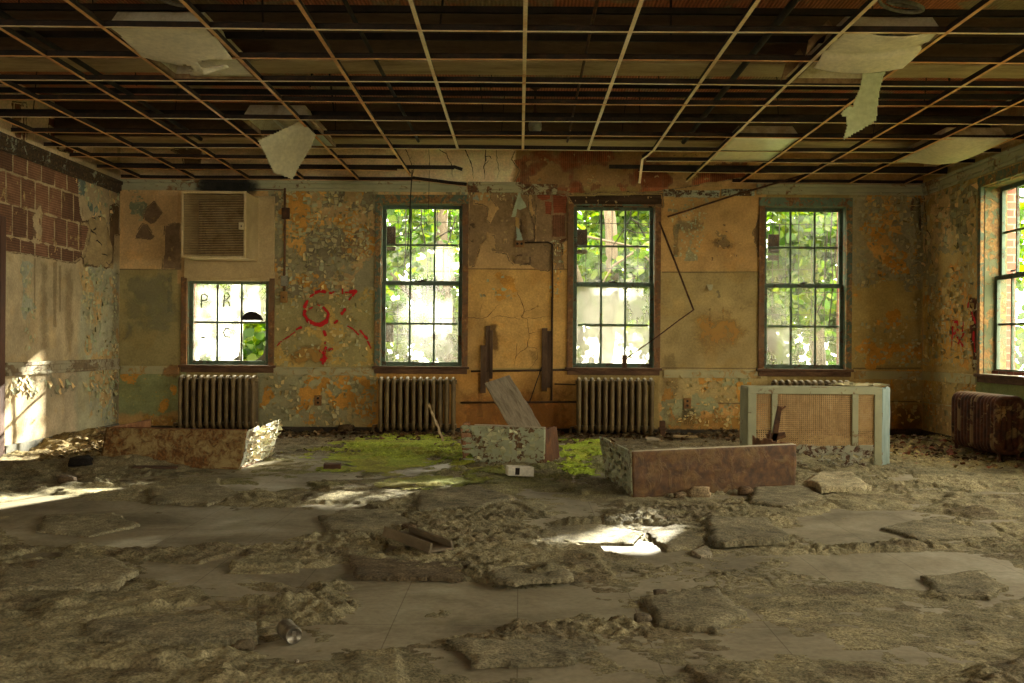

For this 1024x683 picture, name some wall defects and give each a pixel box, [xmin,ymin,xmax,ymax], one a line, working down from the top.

spalling [0,150,181,426]
peeling [244,180,400,465]
spalling [446,150,759,301]
peeling [660,373,751,429]
peeling [833,182,978,429]